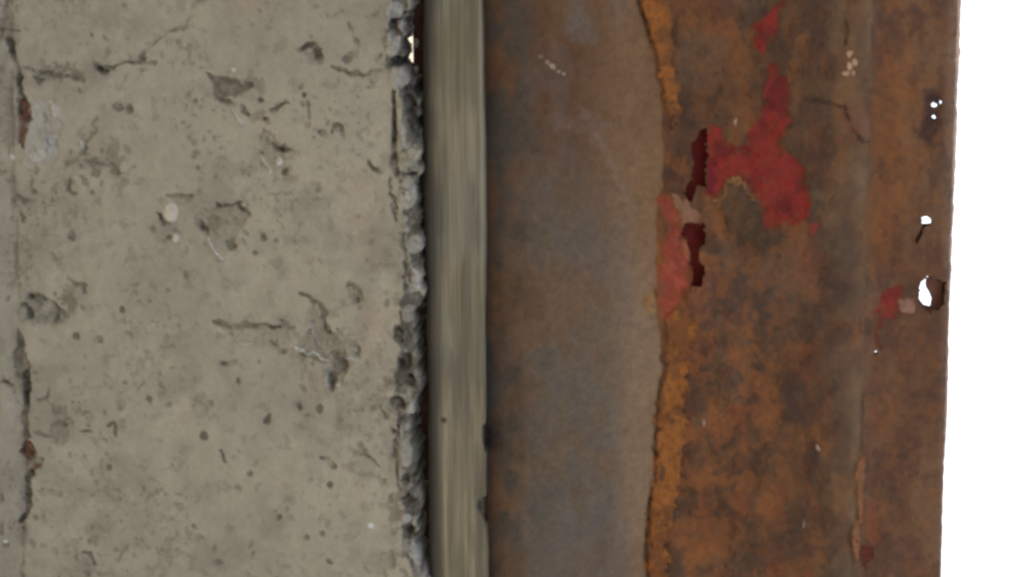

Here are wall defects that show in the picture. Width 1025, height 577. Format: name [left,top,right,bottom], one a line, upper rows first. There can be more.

crack [5,162,44,282]
crack [0,0,210,101]
spalling [202,0,432,577]
rust [641,0,684,132]
peeling [641,189,703,323]
rust [709,175,793,258]
peeling [702,0,822,239]
rust [858,28,947,284]
crack [6,324,39,577]
rust [642,308,699,577]
rust [847,452,868,565]